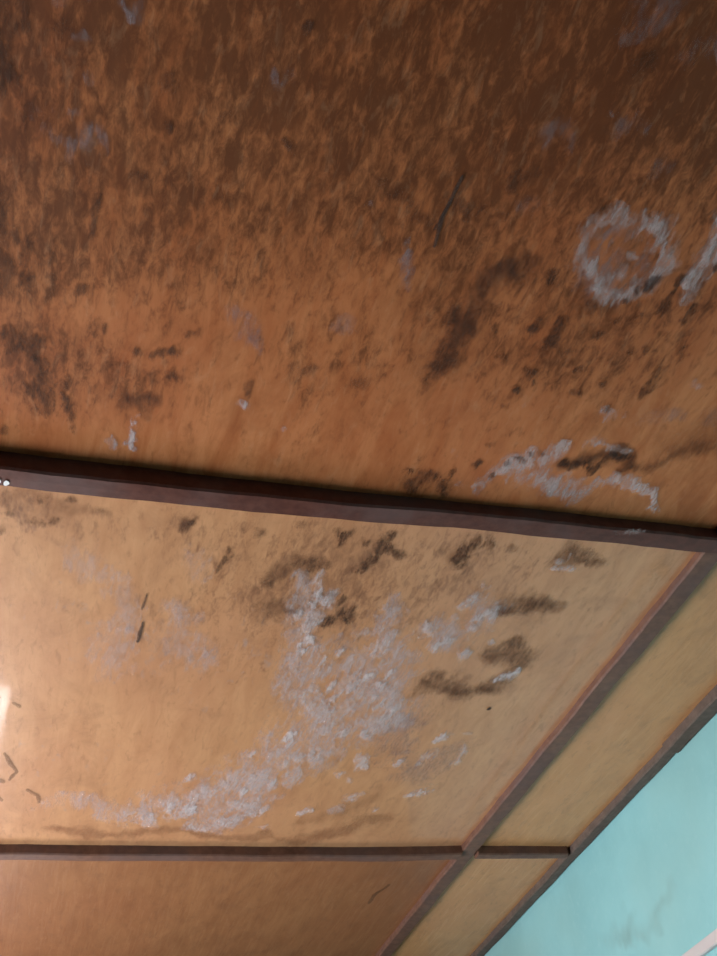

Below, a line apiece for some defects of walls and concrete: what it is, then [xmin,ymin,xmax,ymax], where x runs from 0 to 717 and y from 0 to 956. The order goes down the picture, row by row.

damp [488,440,657,504]
damp [295,572,355,627]
damp [166,603,413,832]